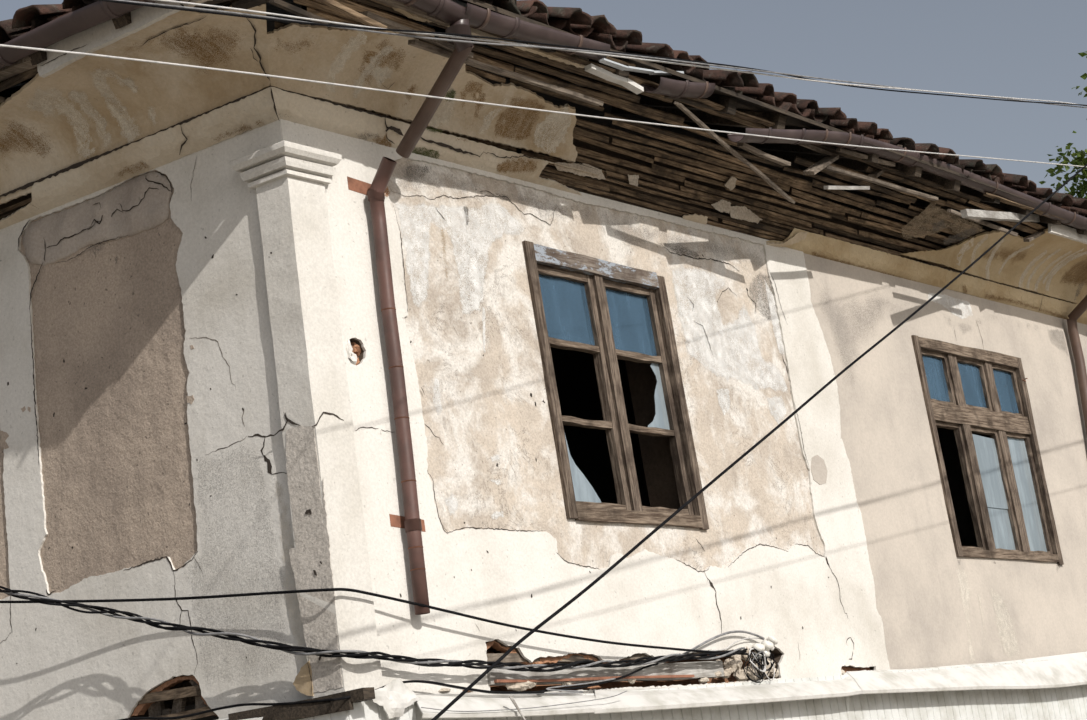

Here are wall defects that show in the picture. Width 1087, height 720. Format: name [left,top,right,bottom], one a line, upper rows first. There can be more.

leakage [0,67,158,159]
crack [0,19,594,197]
leakage [429,81,572,174]
crack [391,190,573,226]
flaking render [387,157,827,573]
crack [662,245,769,355]
leakage [901,203,1087,301]
leakage [945,294,1069,356]
flaking render [18,170,343,720]
crack [207,411,390,475]
flaking render [0,431,10,599]
crack [697,540,722,634]